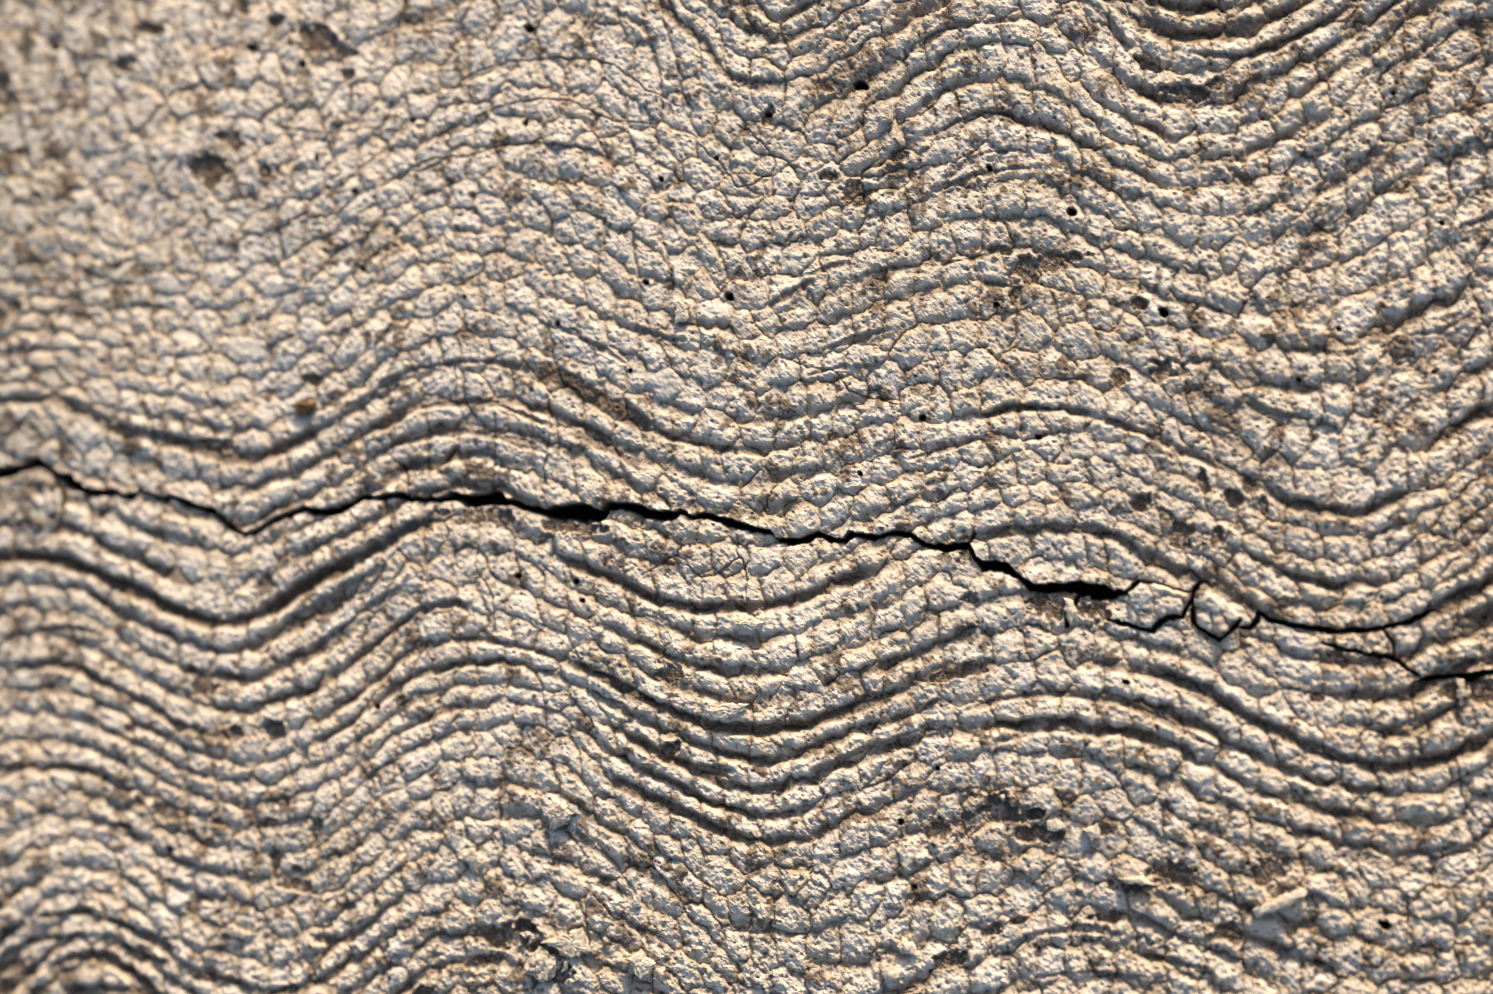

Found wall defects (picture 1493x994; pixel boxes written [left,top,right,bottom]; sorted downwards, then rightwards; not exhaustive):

crack [22,1,38,33]
crack [838,0,887,59]
crack [903,9,964,84]
crack [994,0,1088,59]
crack [0,158,90,212]
crack [813,65,1190,287]
crack [1098,0,1493,525]